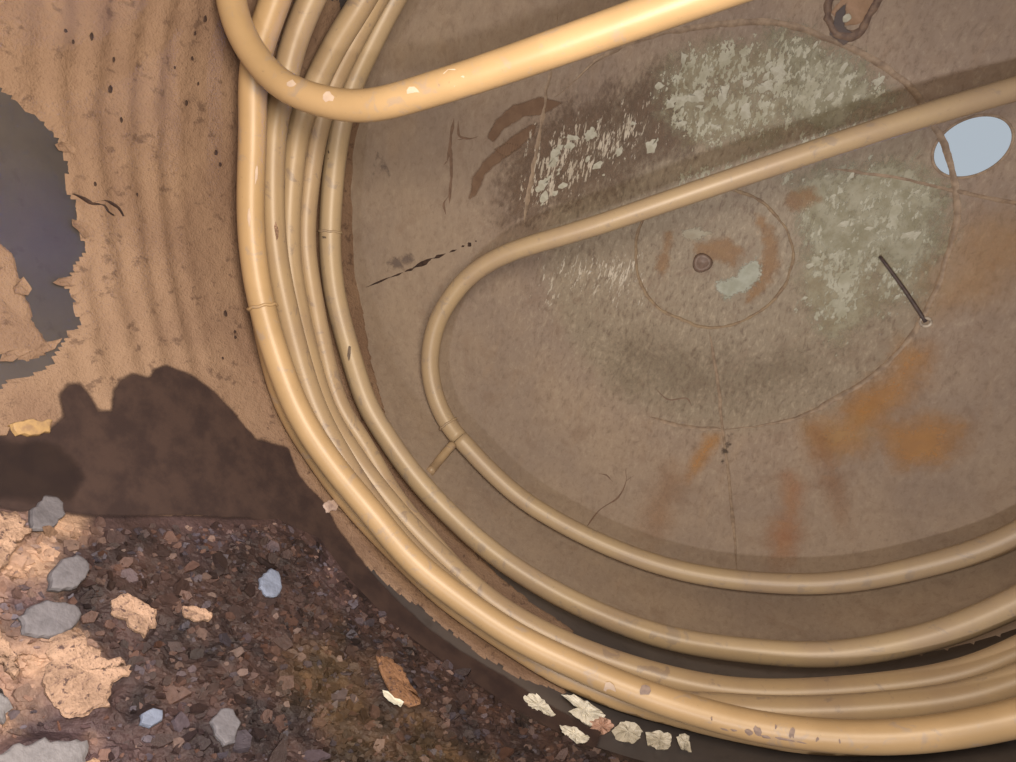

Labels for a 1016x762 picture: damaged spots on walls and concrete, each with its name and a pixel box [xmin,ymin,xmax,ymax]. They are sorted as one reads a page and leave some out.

leakage [469,26,904,217]
crack [368,240,477,287]
leakage [533,246,647,311]
leakage [716,261,762,299]
leakage [781,152,950,356]
peeling [0,0,692,753]